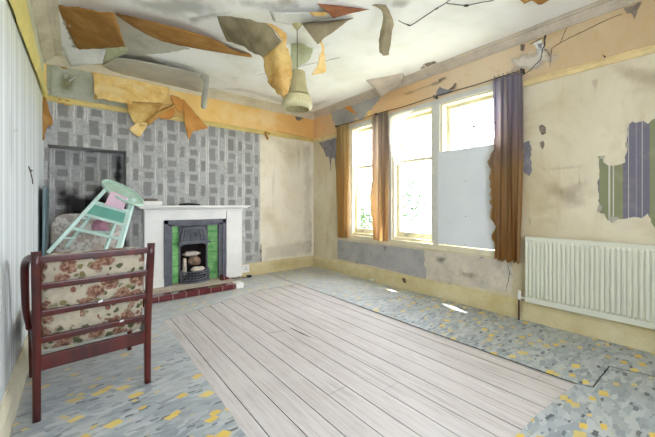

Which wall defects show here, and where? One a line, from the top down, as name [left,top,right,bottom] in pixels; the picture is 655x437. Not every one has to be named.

peeling [115,14,202,74]
peeling [47,64,127,112]
peeling [319,96,380,164]
flaking render [523,141,532,176]